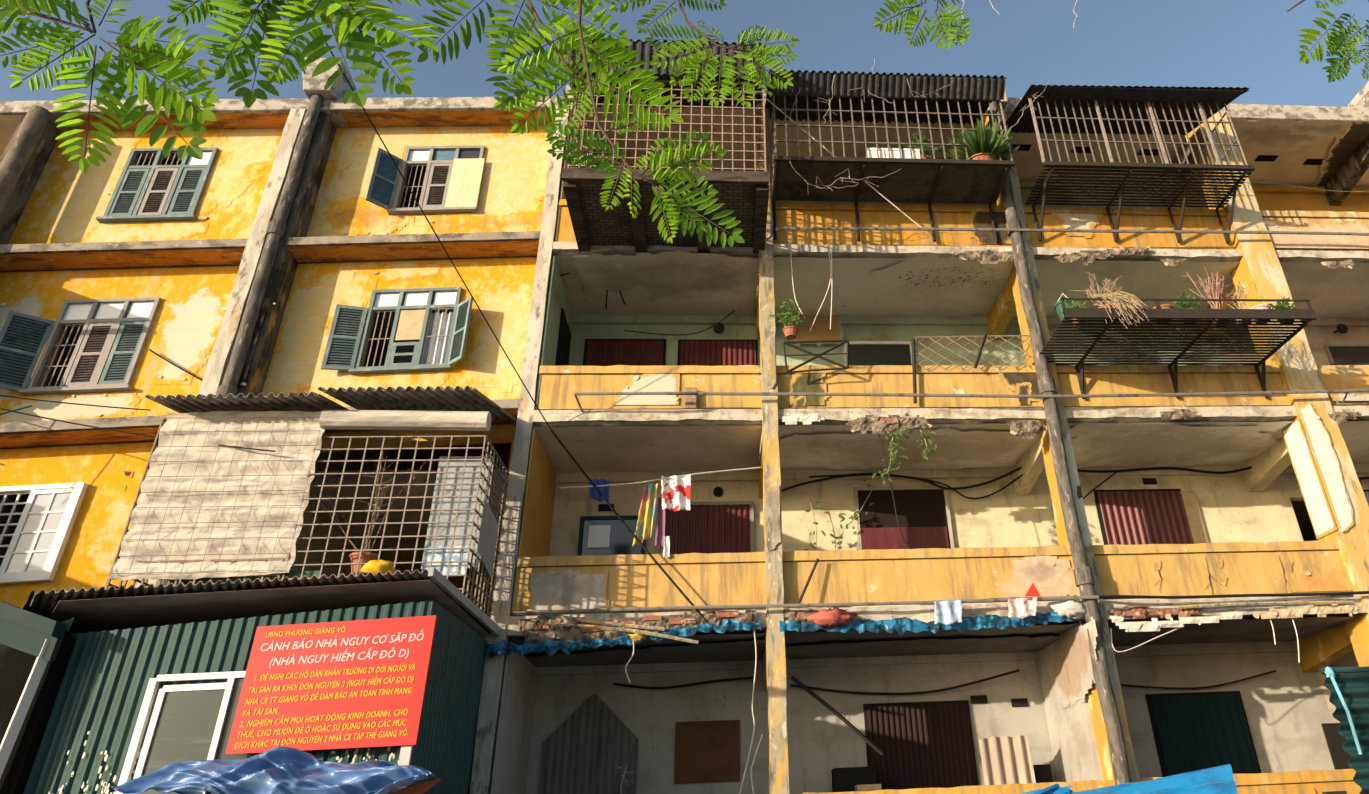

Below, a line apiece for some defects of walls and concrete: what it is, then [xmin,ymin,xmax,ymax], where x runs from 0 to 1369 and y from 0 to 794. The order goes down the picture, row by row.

peeling [0,286,232,423]
peeling [612,373,680,405]
peeling [1314,369,1369,425]
peeling [1107,563,1369,632]
spalling [520,609,757,643]